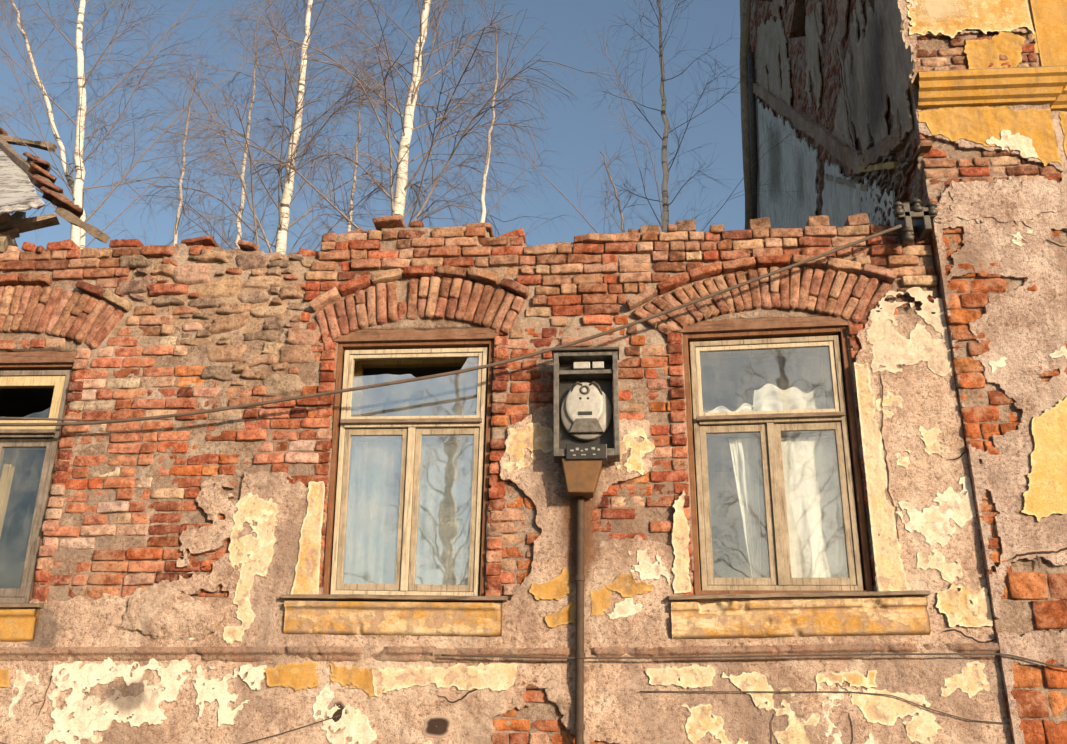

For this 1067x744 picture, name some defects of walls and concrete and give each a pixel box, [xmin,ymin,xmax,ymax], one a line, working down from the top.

flaking render [915,31,1037,73]
flaking render [866,130,1067,630]
peeling [502,422,553,472]
peeling [611,429,655,476]
flaking render [36,548,189,598]
peeling [223,492,279,644]
peeling [529,567,576,628]
peeling [590,548,671,620]
peeling [0,657,575,744]
peeling [645,664,941,744]
peeling [940,661,990,698]
flaking render [999,659,1067,744]